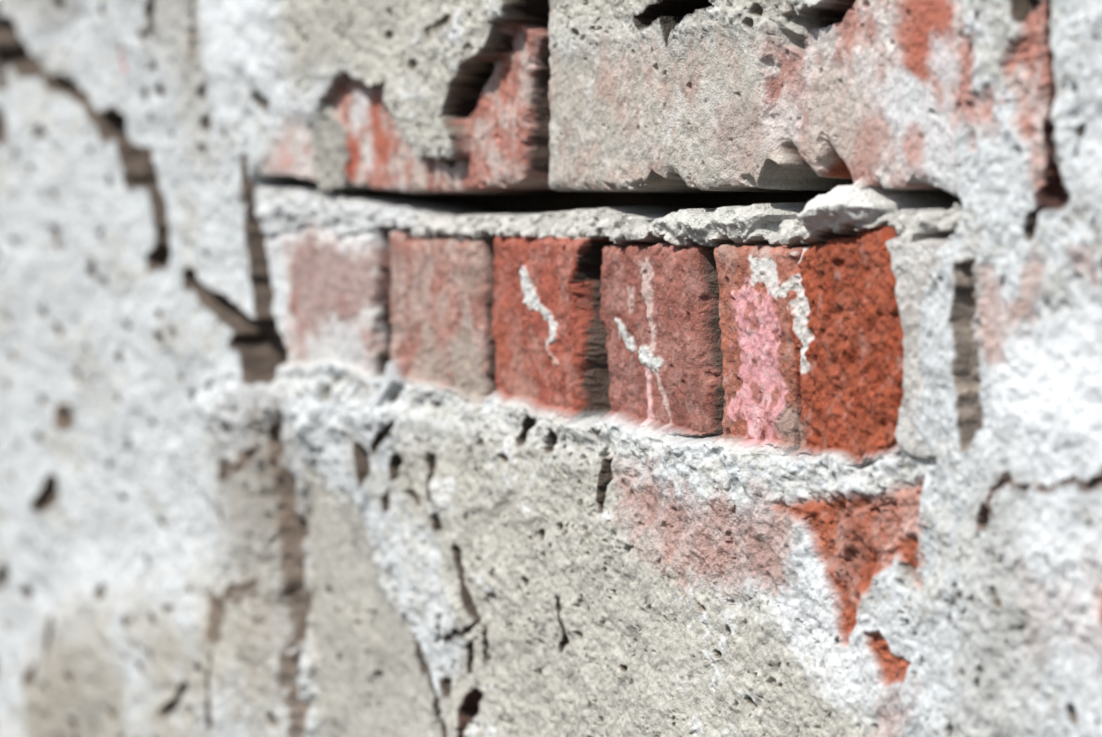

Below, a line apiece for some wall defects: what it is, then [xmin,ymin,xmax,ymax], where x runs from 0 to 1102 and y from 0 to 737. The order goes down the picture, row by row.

crack [146,0,158,41]
crack [186,0,197,62]
crack [0,17,289,386]
crack [158,413,313,737]
crack [352,420,491,737]
spalling [250,0,1071,737]
crack [975,467,1102,533]
peeling [1067,242,1100,293]